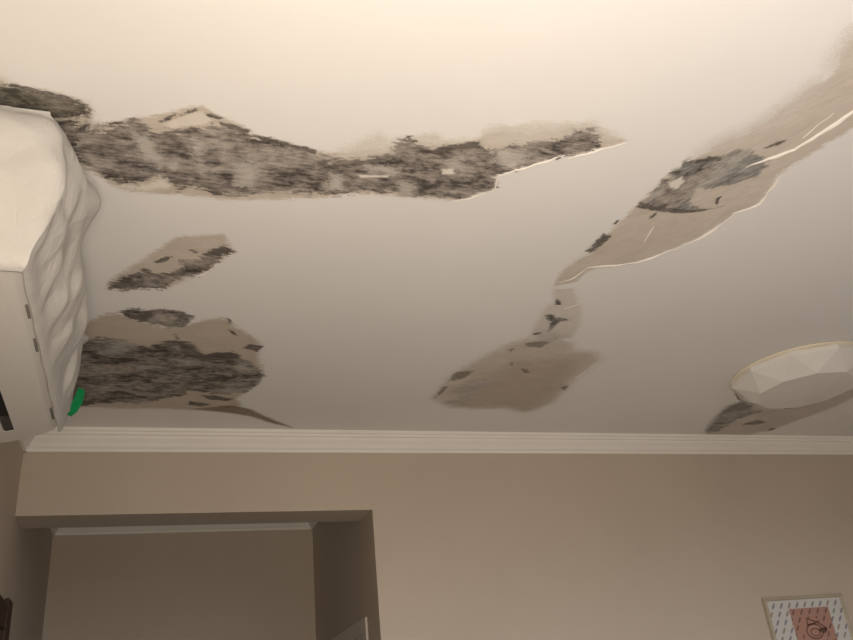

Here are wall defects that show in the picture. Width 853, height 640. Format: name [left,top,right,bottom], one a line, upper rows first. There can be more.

peeling [0,75,630,203]
peeling [104,232,237,293]
peeling [428,17,853,413]
peeling [73,307,294,428]
peeling [702,388,853,435]